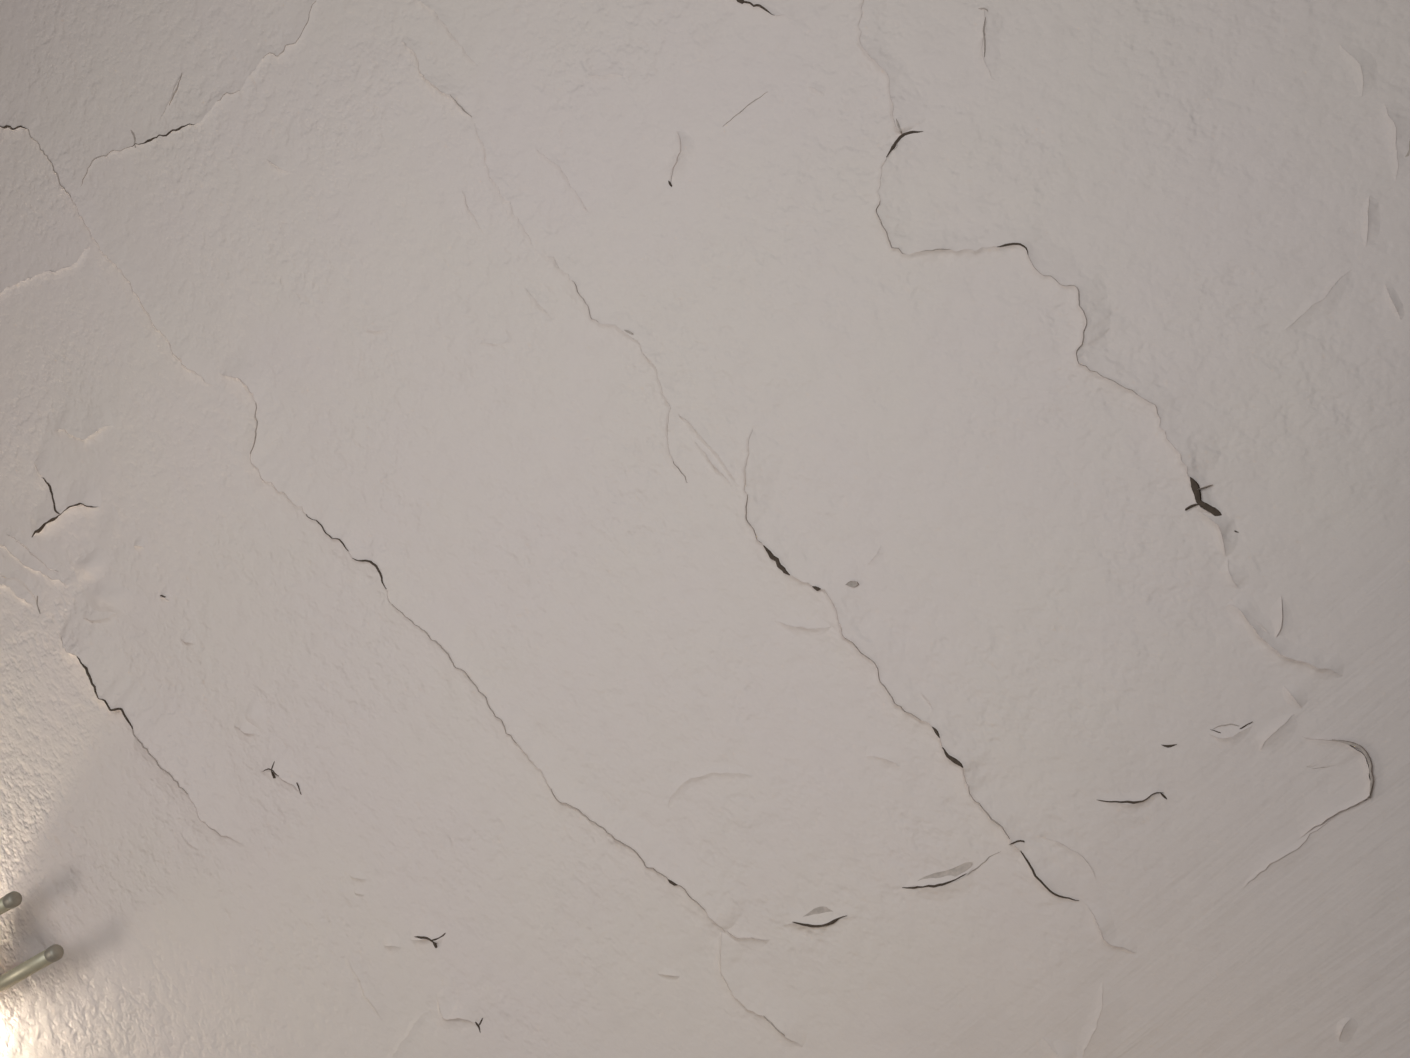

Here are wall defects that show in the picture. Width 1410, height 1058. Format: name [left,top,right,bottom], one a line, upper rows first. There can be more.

peeling [705,0,794,32]
peeling [1244,713,1374,887]
peeling [783,904,857,937]
peeling [902,835,1137,954]